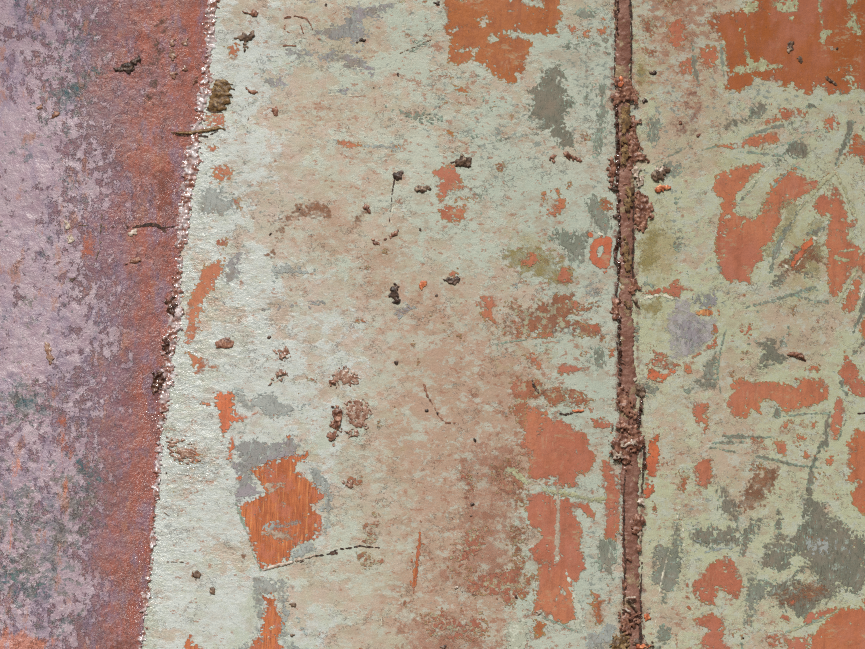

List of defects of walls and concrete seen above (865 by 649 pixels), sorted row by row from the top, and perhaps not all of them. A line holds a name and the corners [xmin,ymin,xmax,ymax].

peeling [385,101,455,137]
peeling [414,152,483,223]
peeling [388,283,417,320]
peeling [419,0,865,649]
peeling [199,384,334,535]
peeling [251,534,316,649]
peeling [356,512,385,569]
peeling [403,520,425,608]